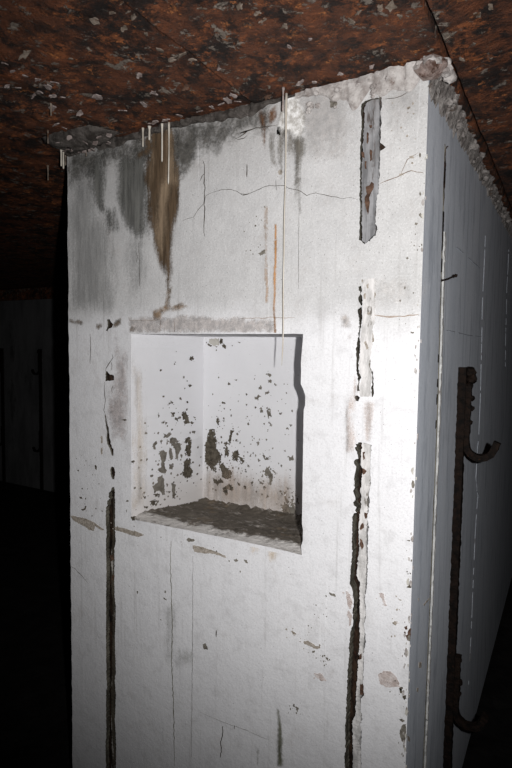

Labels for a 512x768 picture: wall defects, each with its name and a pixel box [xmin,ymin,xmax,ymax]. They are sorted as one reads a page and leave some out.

water stain [68,108,266,289]
crack [185,162,358,237]
rust [267,225,277,332]
spalling [64,56,512,240]
rust [365,182,374,213]
peeling [70,373,299,537]
spalling [378,596,419,768]